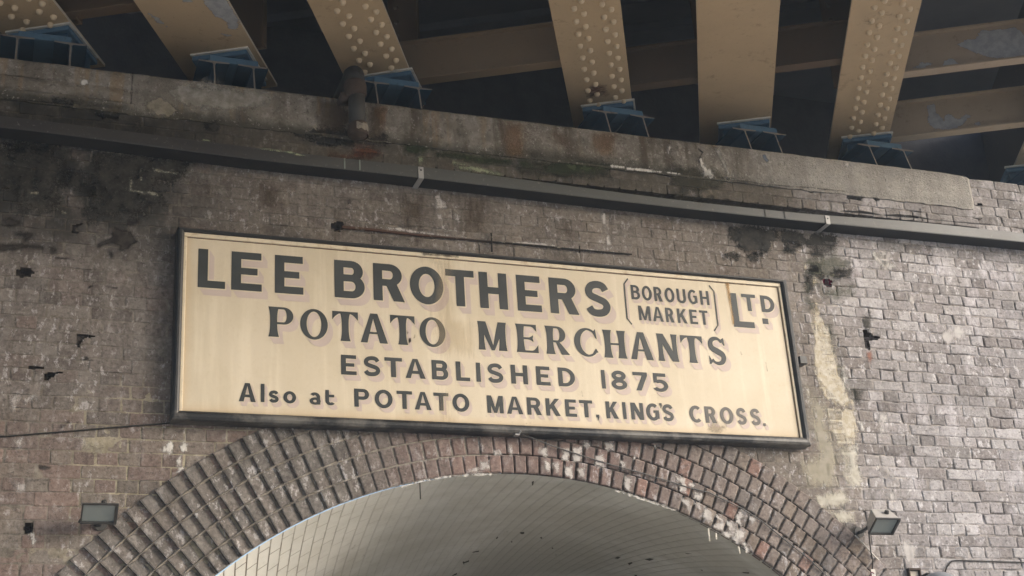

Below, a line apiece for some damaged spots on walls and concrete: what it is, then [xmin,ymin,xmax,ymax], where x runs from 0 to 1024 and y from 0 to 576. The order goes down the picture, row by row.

peeling [183,0,240,37]
peeling [957,27,1024,58]
spalling [16,267,35,277]
spalling [28,366,63,381]
leakage [811,300,864,532]